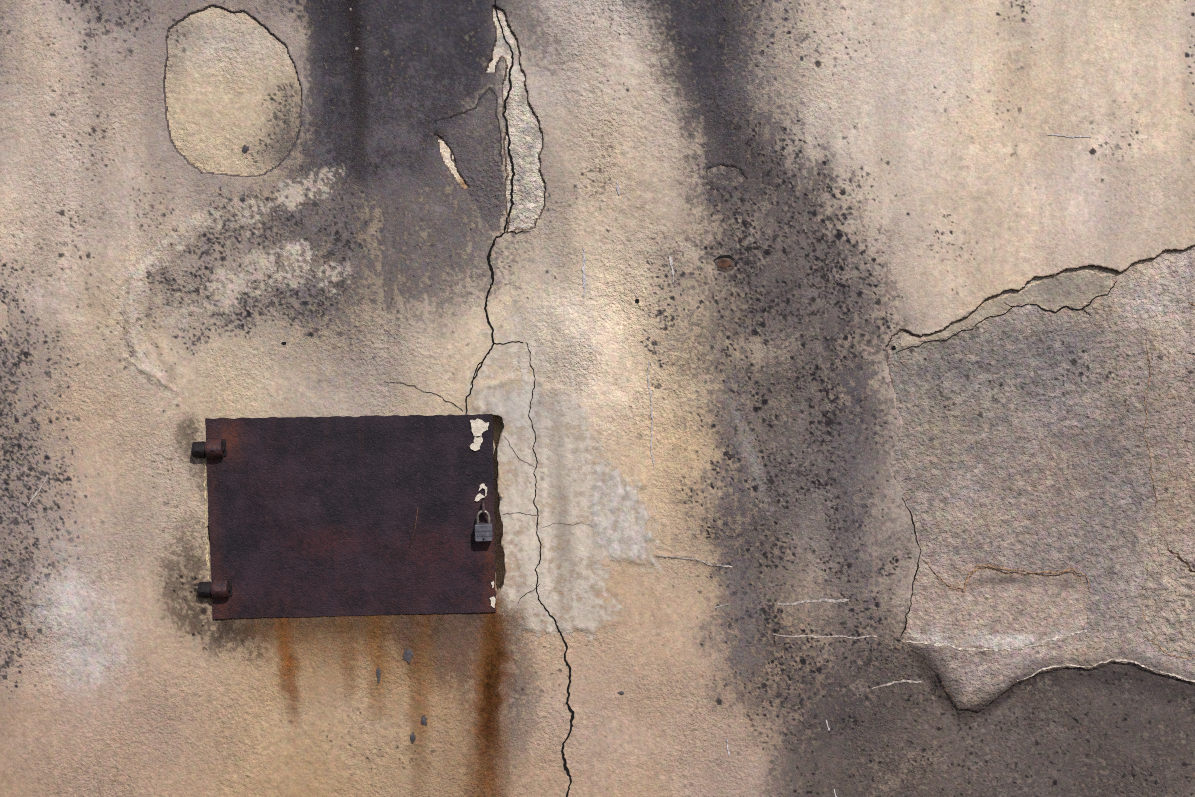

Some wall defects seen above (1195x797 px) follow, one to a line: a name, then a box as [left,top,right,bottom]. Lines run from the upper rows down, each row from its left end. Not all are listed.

water stain [67,0,150,31]
spalling [163,5,303,177]
water stain [120,0,500,388]
spalling [434,6,546,234]
water stain [0,262,96,699]
crack [384,0,584,797]
water stain [642,0,1195,797]
spalling [885,245,1195,711]
corrosion [477,632,504,797]